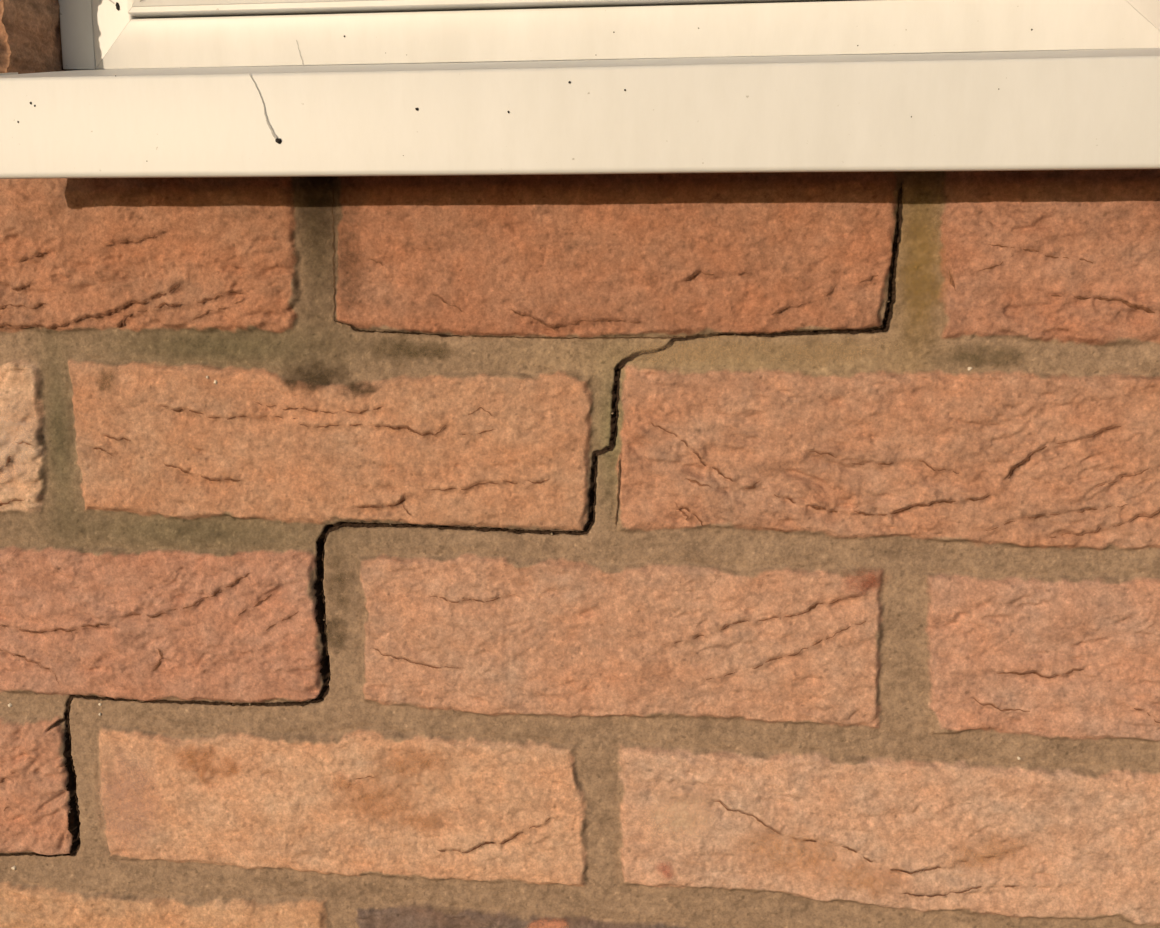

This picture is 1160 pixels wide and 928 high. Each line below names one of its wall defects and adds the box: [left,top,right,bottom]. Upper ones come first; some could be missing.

crack [0,183,903,857]
crack [714,801,1015,897]